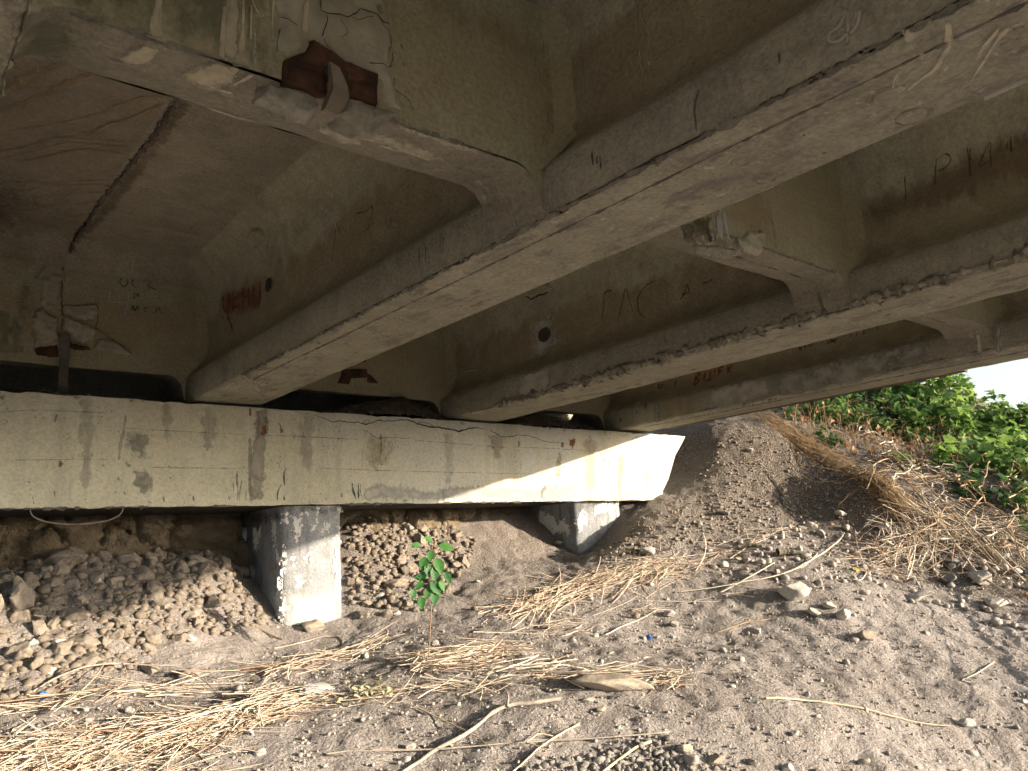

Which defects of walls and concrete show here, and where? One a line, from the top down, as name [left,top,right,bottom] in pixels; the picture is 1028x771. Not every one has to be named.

spalling [252,85,318,125]
rust [280,40,378,107]
spalling [327,100,399,139]
crack [320,0,413,109]
crack [69,97,184,254]
spalling [692,230,766,259]
water stain [118,416,152,493]
water stain [231,342,268,500]
crack [285,408,560,443]